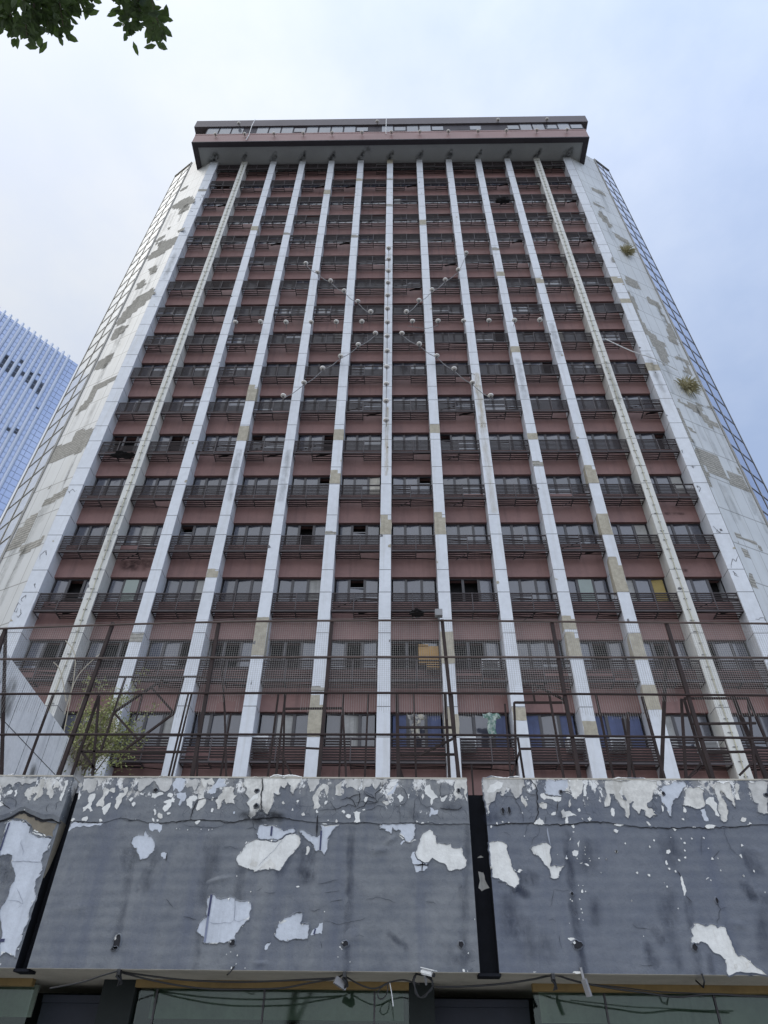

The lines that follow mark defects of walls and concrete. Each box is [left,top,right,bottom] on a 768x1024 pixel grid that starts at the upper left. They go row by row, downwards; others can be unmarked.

peeling [0,774,409,969]
crack [0,782,468,850]
peeling [378,775,768,902]
crack [489,779,763,857]
peeling [690,922,768,977]